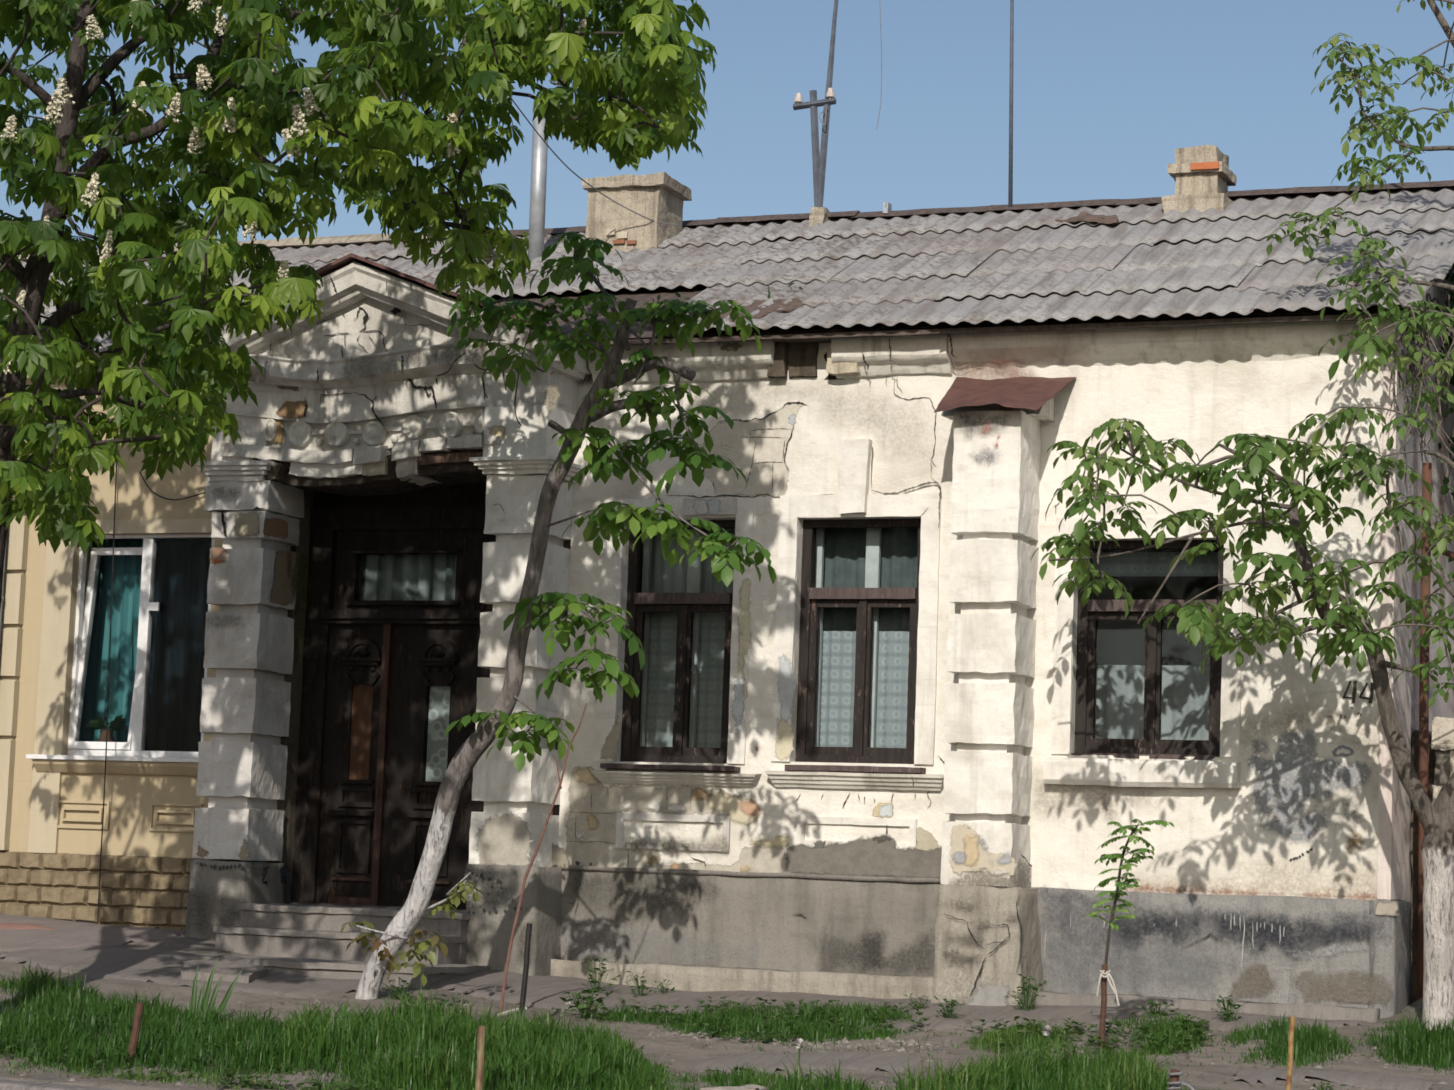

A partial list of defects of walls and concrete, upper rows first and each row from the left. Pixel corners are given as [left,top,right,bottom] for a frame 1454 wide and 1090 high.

crack [241,276,438,430]
crack [949,335,988,370]
flaking render [273,385,306,444]
crack [862,338,942,528]
peeling [732,579,751,734]
peeling [775,655,795,760]
peeling [463,811,533,907]
peeling [551,710,788,873]
peeling [872,803,894,818]
peeling [916,824,1017,877]
crack [944,899,1022,995]
leakage [1224,914,1285,968]